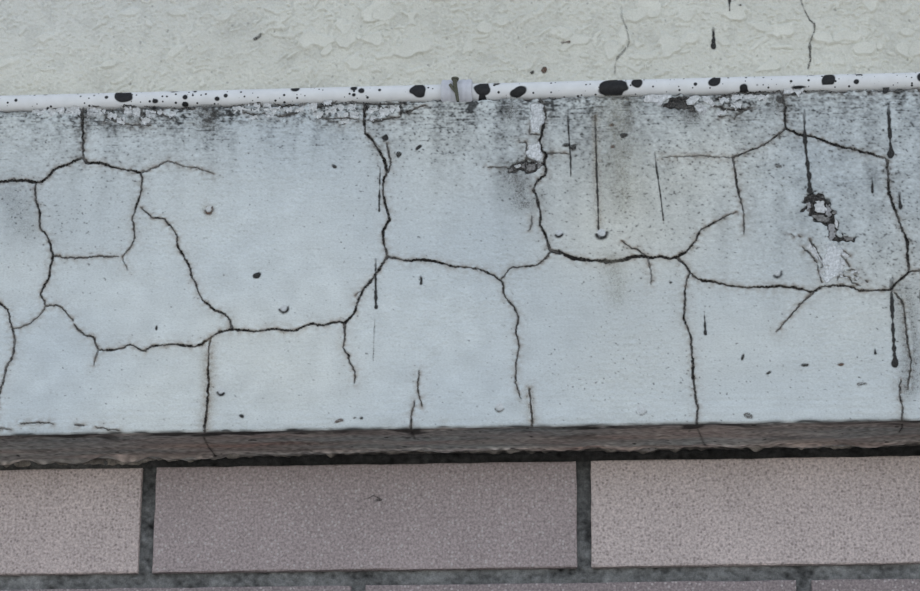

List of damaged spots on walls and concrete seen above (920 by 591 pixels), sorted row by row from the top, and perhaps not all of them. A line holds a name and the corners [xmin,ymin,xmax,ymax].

damp [474,83,500,101]
damp [507,86,526,115]
damp [599,79,642,96]
spalling [643,88,842,117]
damp [822,75,835,85]
damp [887,109,895,158]
damp [803,119,813,193]
spalling [800,193,868,286]
crack [0,92,918,431]